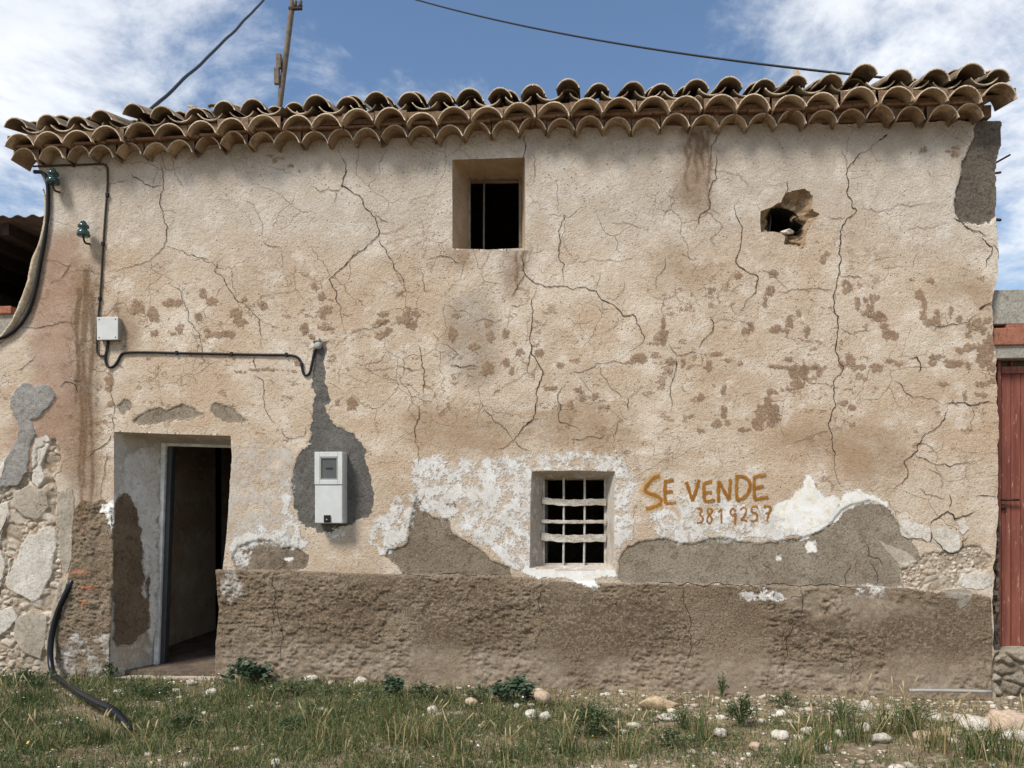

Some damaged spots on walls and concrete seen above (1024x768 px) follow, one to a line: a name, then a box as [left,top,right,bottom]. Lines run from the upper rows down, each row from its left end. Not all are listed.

spalling [0,435,161,678]
crack [89,396,115,495]
crack [26,167,306,439]
spalling [104,370,248,425]
flaking render [334,396,358,410]
crack [311,145,463,349]
crack [362,333,477,467]
spalling [366,450,992,621]
crack [473,133,999,491]
spalling [760,189,819,247]
crack [894,356,995,554]
spalling [944,120,1002,225]